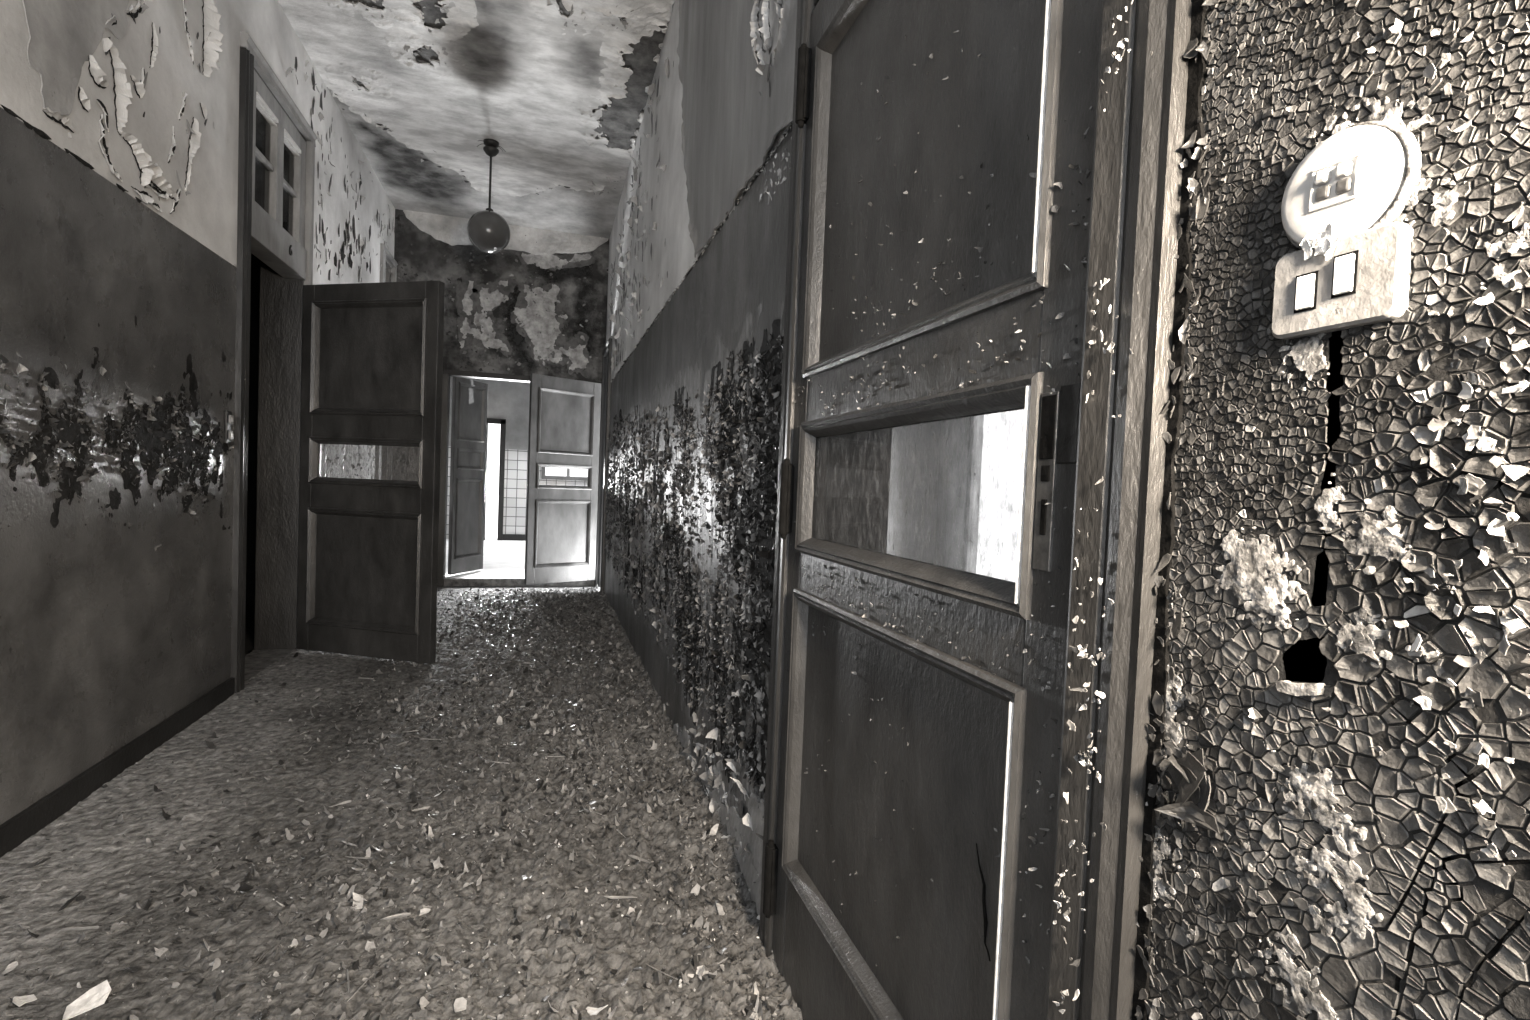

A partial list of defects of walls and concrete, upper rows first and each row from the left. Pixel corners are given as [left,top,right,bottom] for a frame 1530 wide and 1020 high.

peeling [0,0,215,214]
damp [468,1,507,68]
peeling [278,0,797,383]
peeling [1083,0,1133,139]
peeling [956,278,1133,403]
peeling [1474,292,1495,305]
peeling [0,347,234,530]
peeling [321,444,375,479]
peeling [604,247,993,920]
flaking render [1132,0,1284,1020]
flaking render [1231,636,1343,810]
peeling [1019,771,1107,967]